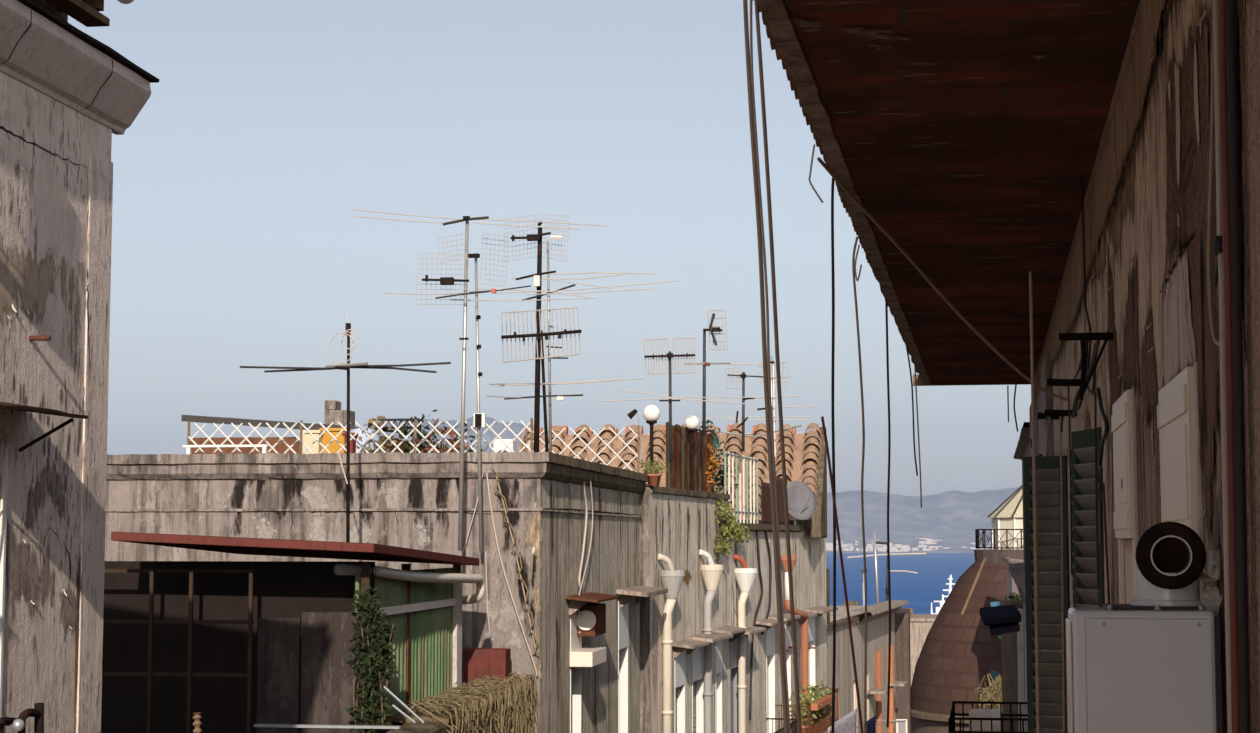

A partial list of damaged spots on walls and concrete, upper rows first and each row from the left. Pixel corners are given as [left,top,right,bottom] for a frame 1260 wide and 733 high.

crack [1104,0,1173,220]
peeling [0,229,87,367]
peeling [1090,154,1157,501]
peeling [1165,5,1224,619]
water stain [214,478,459,549]